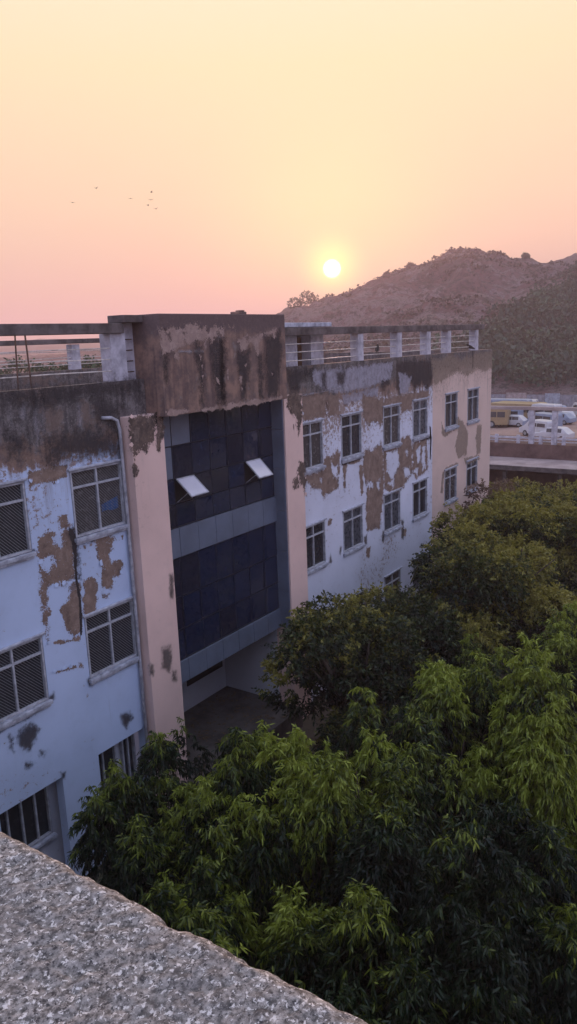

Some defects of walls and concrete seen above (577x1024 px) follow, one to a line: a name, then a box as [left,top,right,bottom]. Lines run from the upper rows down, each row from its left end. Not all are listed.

water stain [1,378,140,467]
water stain [195,331,345,404]
peeling [126,321,429,477]
water stain [382,349,493,395]
peeling [28,464,69,488]
peeling [293,434,428,532]
crack [69,528,83,636]
peeling [36,514,123,645]